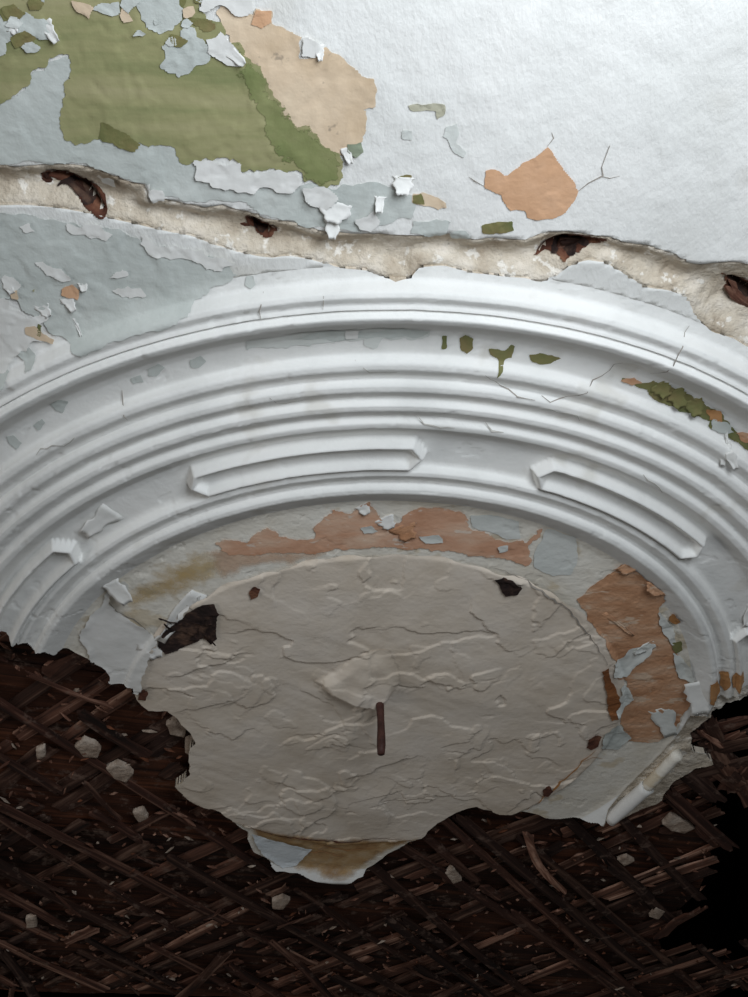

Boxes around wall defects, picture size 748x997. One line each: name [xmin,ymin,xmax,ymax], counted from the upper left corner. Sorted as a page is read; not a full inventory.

peeling [0,0,748,391]
peeling [621,378,748,471]
peeling [215,502,542,574]
spalling [495,577,522,597]
peeling [79,578,219,695]
peeling [577,564,748,827]
peeling [251,834,312,869]
water stain [243,824,406,877]